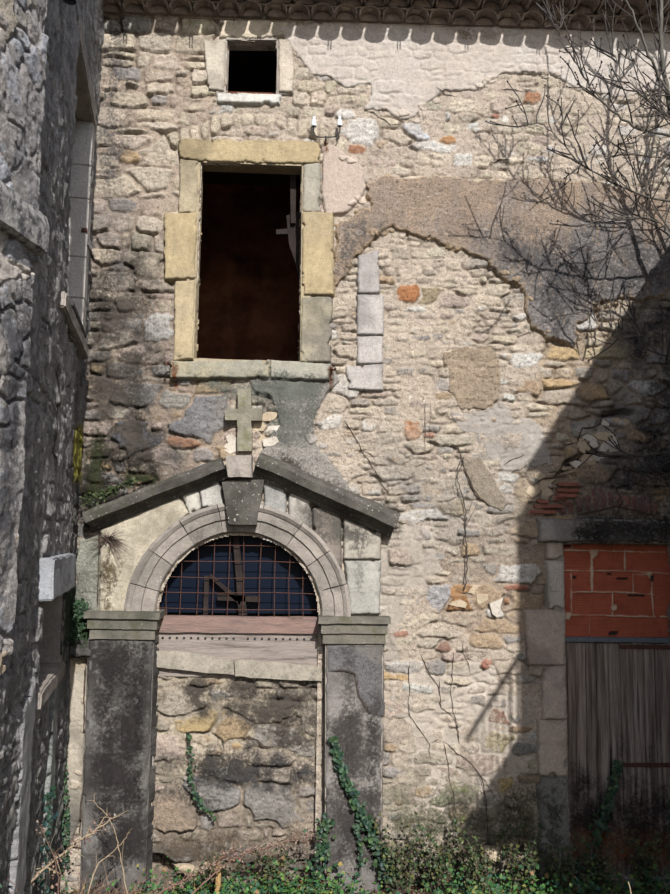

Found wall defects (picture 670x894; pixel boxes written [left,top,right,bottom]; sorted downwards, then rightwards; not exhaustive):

flaking render [279,23,670,124]
peeling [338,155,358,164]
flaking render [333,174,670,348]
leakage [499,240,670,325]
leakage [72,253,161,513]
leakage [93,646,146,863]
leakage [183,677,317,790]
leakage [326,700,382,865]
leakage [156,838,285,880]